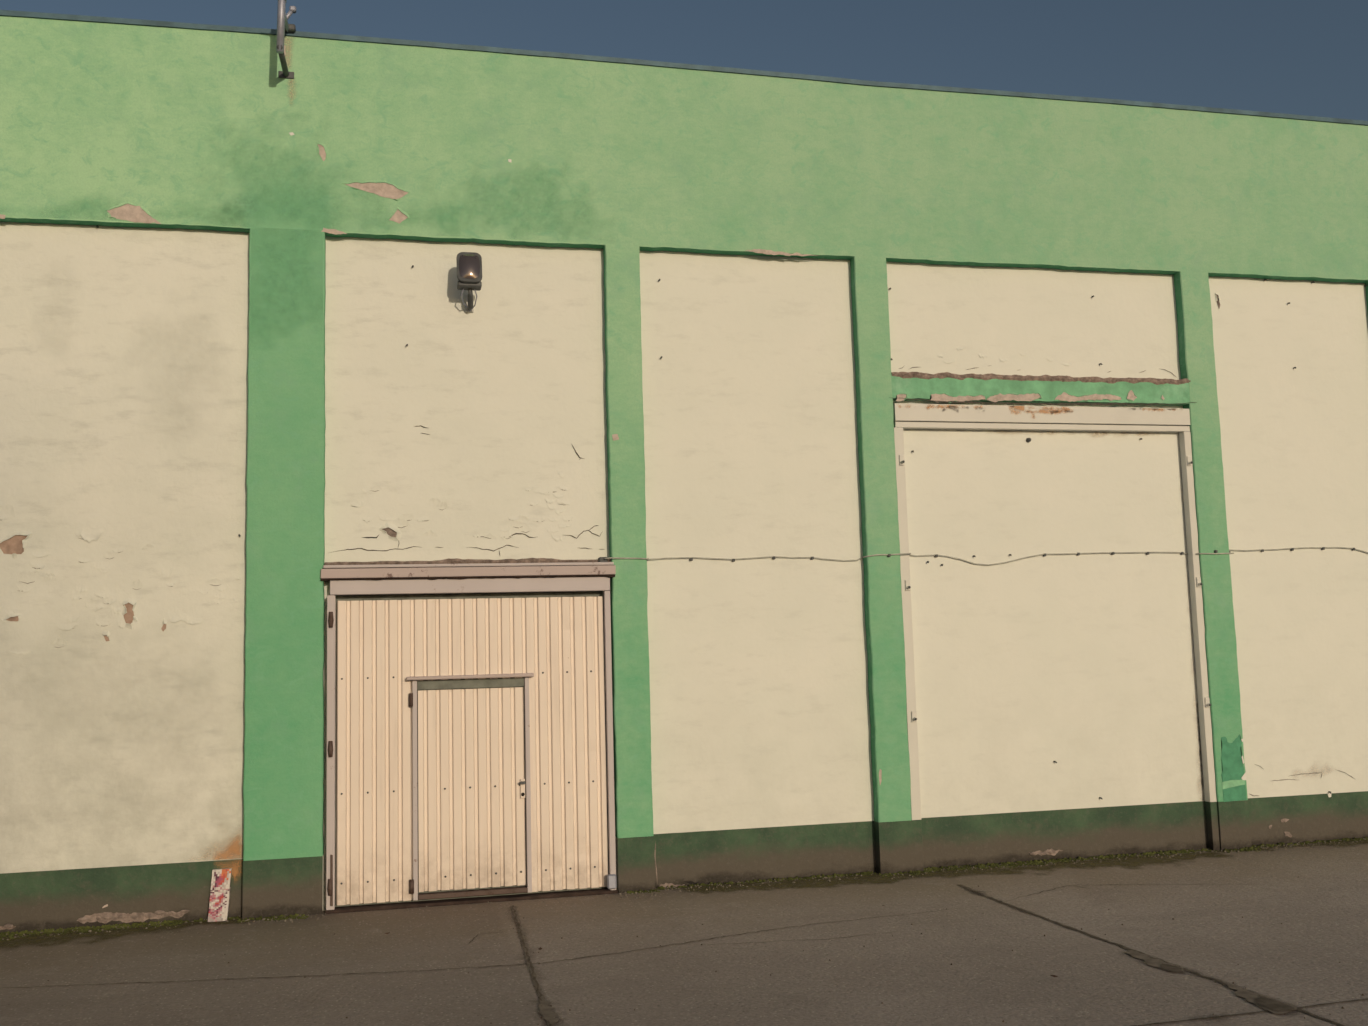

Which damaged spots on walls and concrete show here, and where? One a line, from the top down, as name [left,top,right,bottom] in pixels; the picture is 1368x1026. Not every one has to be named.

peeling [105,202,161,224]
peeling [342,180,410,224]
spalling [891,372,1191,404]
peeling [0,531,32,559]
peeling [379,523,402,541]
peeling [102,598,138,641]
peeling [1221,734,1247,802]